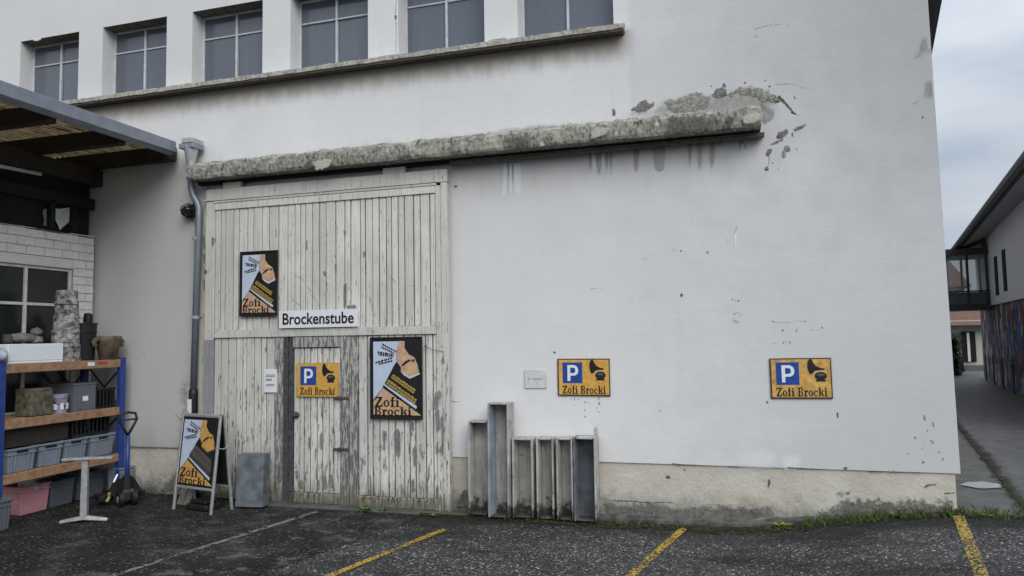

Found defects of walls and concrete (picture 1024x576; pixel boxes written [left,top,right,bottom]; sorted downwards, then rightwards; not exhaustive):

flaking render [631,80,780,132]
peeling [765,124,806,171]
water stain [604,500,774,521]
water stain [817,490,953,519]